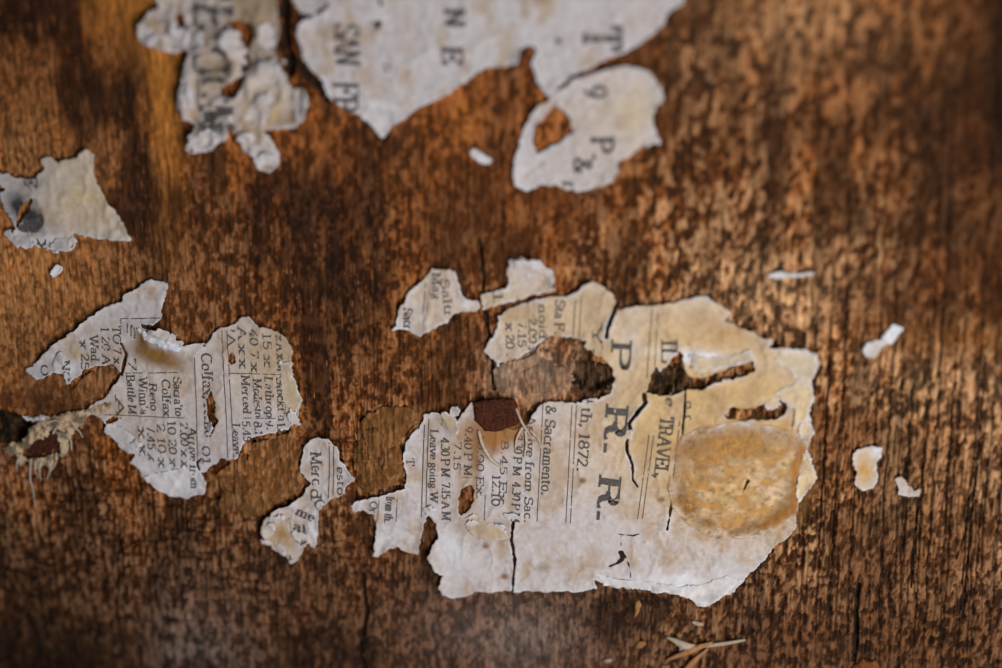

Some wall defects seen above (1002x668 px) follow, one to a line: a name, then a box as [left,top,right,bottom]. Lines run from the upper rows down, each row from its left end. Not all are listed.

peeling [136,25,203,56]
peeling [178,84,192,109]
peeling [185,23,285,154]
peeling [469,148,492,164]
peeling [4,229,37,249]
peeling [514,257,551,280]
peeling [143,328,184,352]
peeling [765,399,782,410]
water stain [679,432,806,533]
peeling [260,515,311,556]
crack [509,521,517,595]
crack [851,582,861,662]